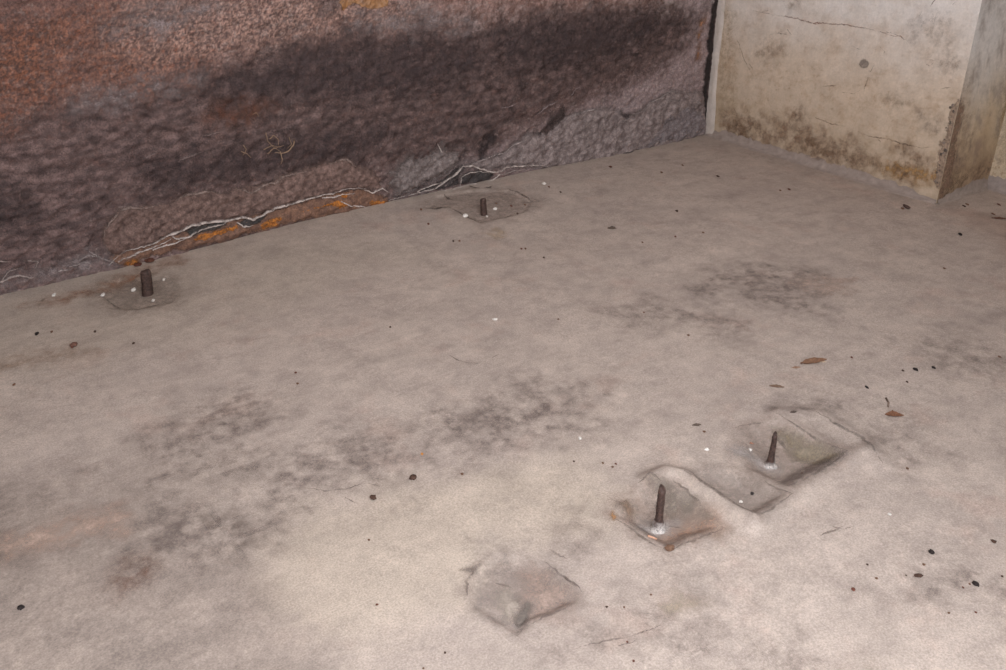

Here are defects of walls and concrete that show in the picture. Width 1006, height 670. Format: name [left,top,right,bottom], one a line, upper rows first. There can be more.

water stain [0,0,694,292]
water stain [723,109,865,165]
rust [102,158,387,286]
crack [0,165,551,283]